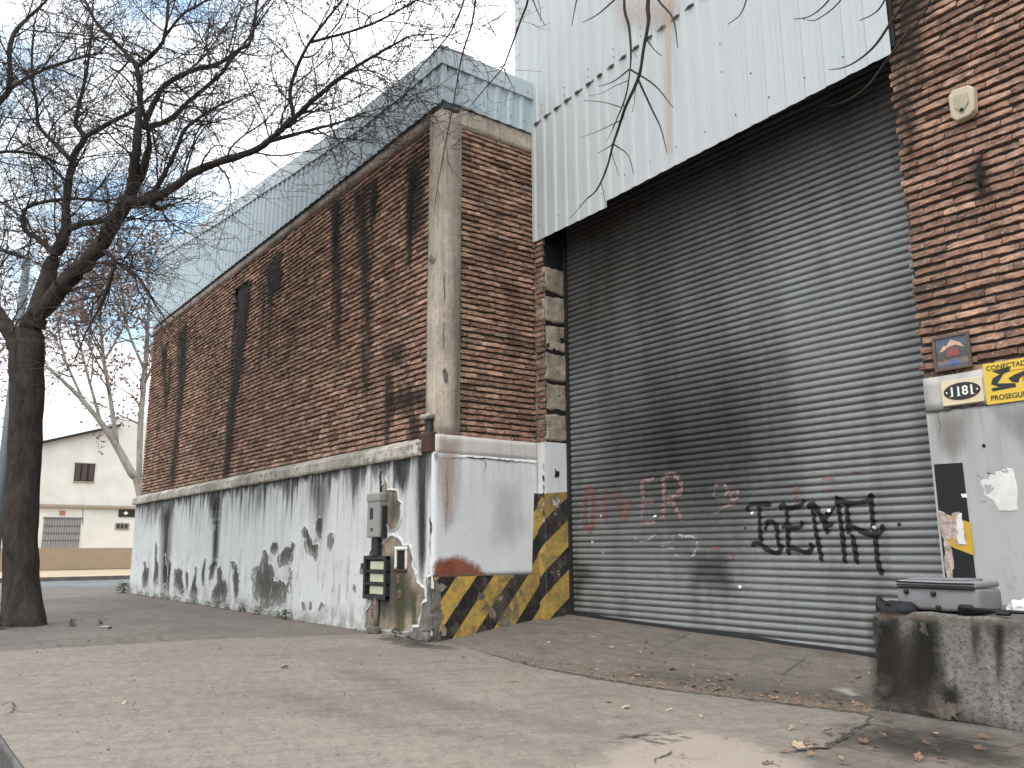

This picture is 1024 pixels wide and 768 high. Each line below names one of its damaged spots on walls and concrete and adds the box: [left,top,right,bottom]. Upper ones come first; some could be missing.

water stain [261,252,281,347]
water stain [331,176,377,395]
water stain [137,281,438,590]
peeling [131,516,335,615]
flaking render [352,477,458,642]
corrosion [435,557,483,577]
water stain [873,621,895,697]
water stain [915,619,937,678]
water stain [942,687,958,704]
water stain [995,625,1003,669]